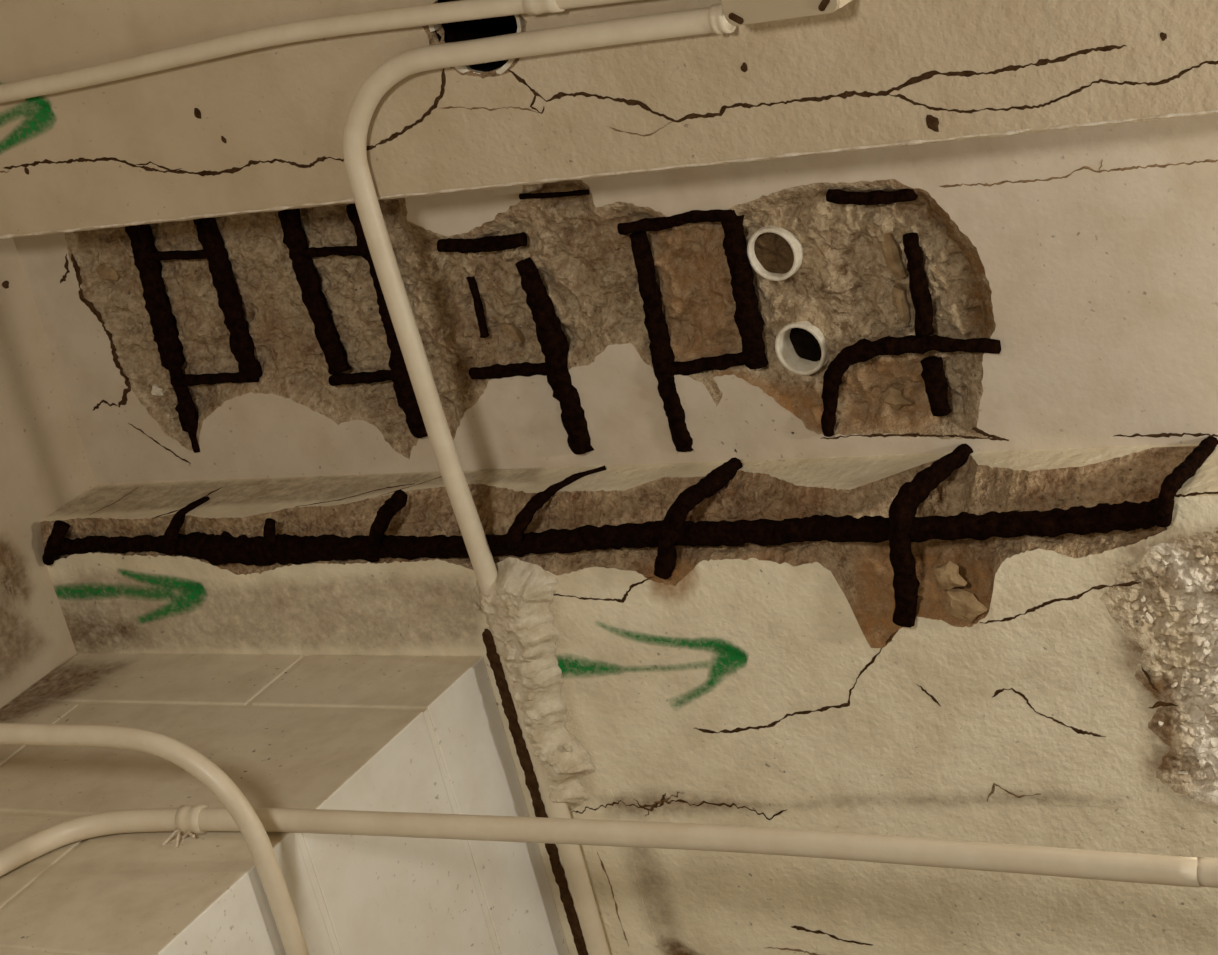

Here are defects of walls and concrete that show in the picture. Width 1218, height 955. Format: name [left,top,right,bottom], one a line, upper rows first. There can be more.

crack [0,45,1218,176]
crack [940,159,1218,188]
corrosion [918,189,995,338]
spalling [65,203,428,459]
corrosion [723,374,823,426]
spalling [40,487,473,575]
spalling [378,179,1218,805]
corrosion [860,552,902,648]
crack [979,581,1141,624]
crack [694,630,898,734]
crack [991,688,1106,737]
crack [482,629,787,955]